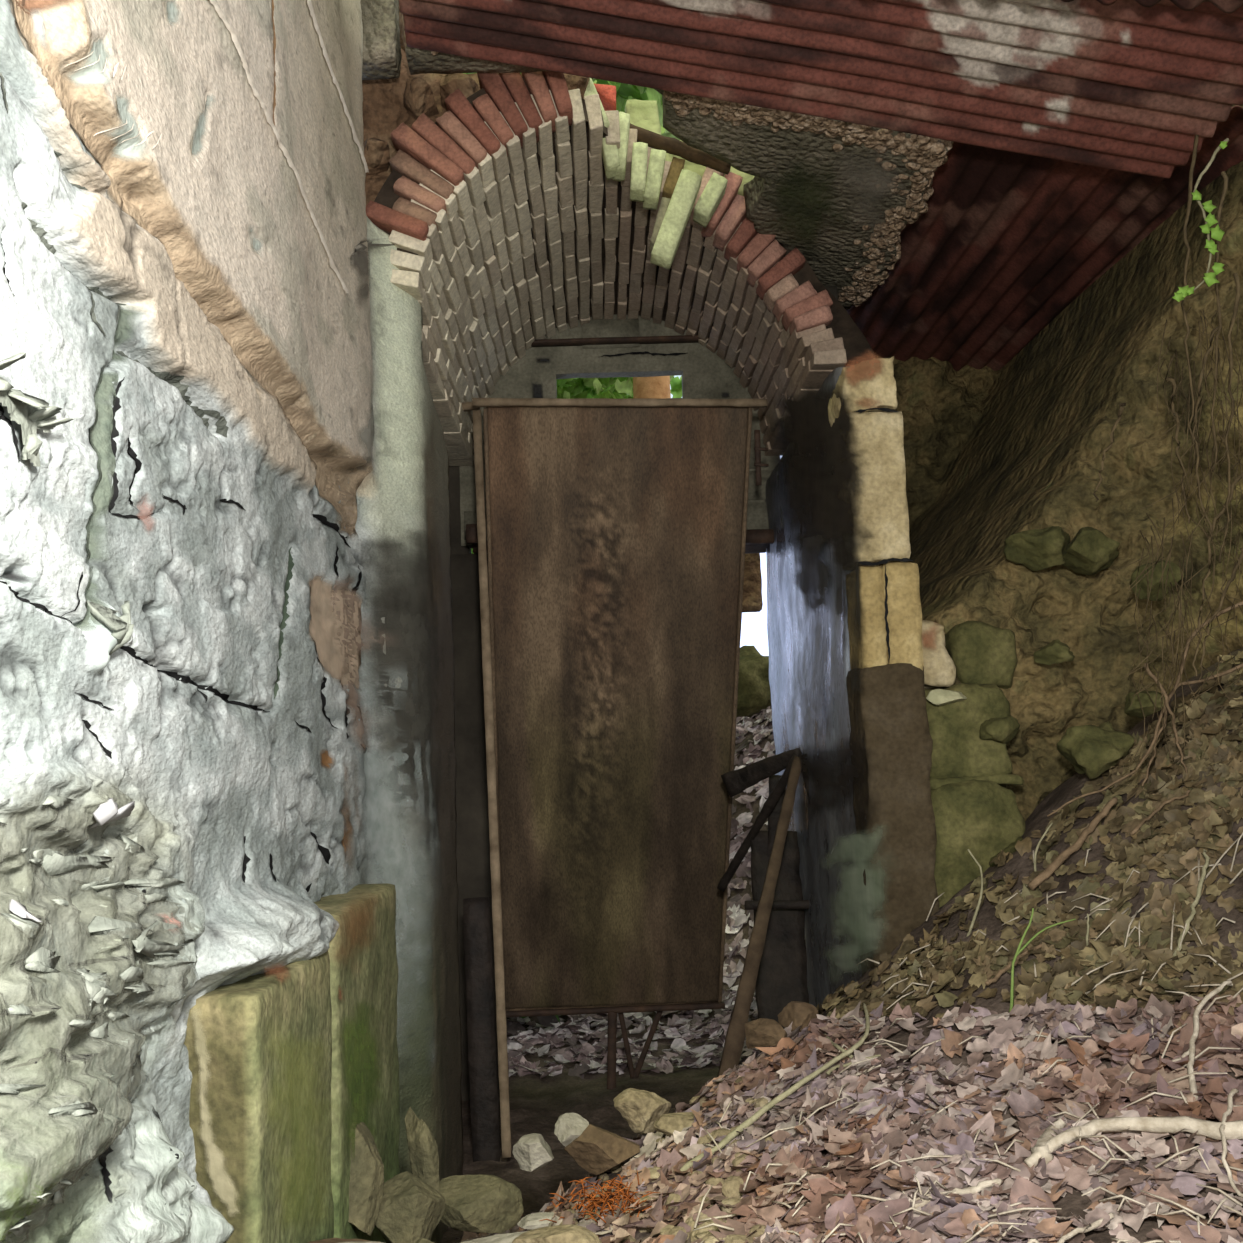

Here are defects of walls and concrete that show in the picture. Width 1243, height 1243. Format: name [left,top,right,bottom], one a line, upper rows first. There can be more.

peeling [0,353,74,467]
crack [22,202,229,519]
spalling [12,0,368,534]
crack [0,572,83,624]
crack [120,547,367,753]
water stain [373,500,437,808]
water stain [773,388,873,639]
water stain [798,741,865,808]
water stain [851,659,860,690]
crack [859,558,914,662]
spalling [0,796,194,1243]
spalling [193,1011,237,1213]